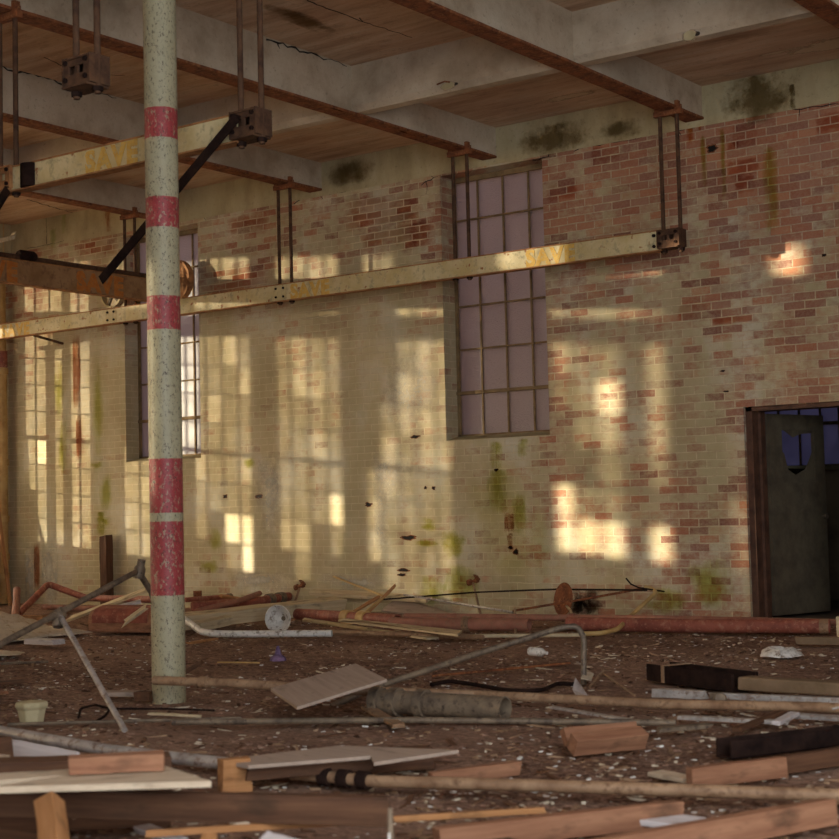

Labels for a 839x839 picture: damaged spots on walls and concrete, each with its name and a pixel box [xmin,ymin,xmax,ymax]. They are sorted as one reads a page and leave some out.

crack [307,0,412,38]
crack [266,39,347,67]